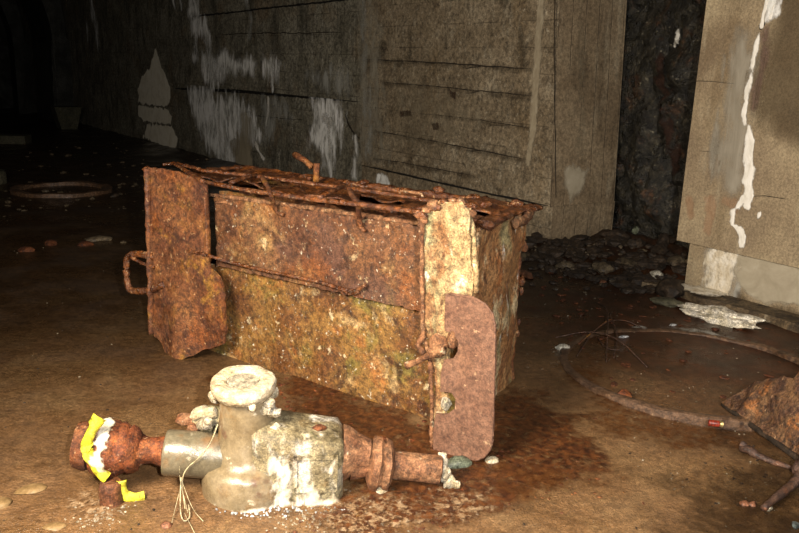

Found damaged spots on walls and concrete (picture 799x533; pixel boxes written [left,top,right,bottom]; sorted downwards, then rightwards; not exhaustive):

spalling [138,48,178,148]
leakage [172,0,287,162]
leakage [310,69,343,178]
leakage [681,0,799,305]